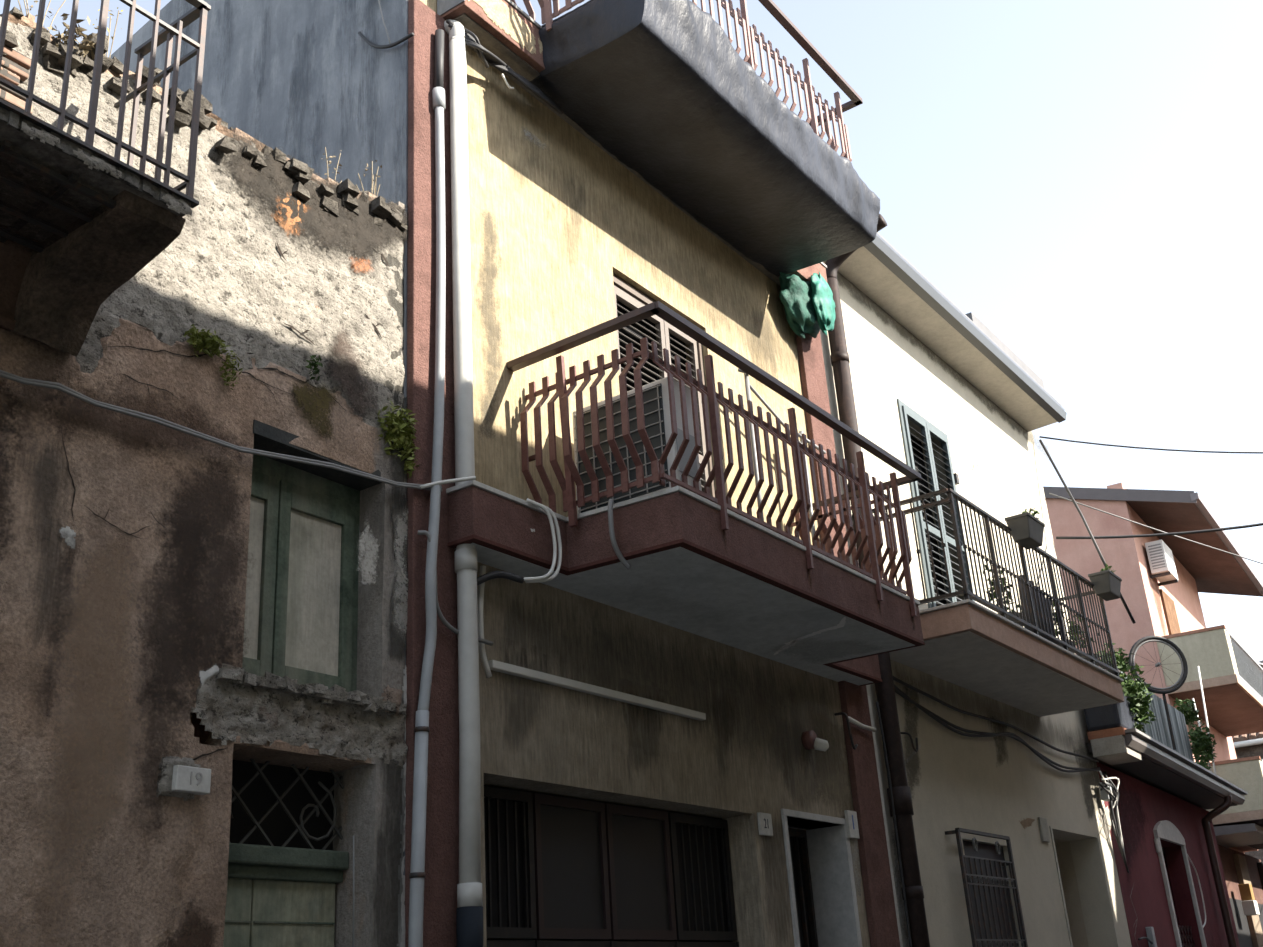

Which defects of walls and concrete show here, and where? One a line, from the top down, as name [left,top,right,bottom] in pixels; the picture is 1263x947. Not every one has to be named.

peeling [13,23,405,428]
water stain [10,353,247,828]
spalling [199,663,407,743]
water stain [158,902,216,947]
peeling [397,762,406,947]